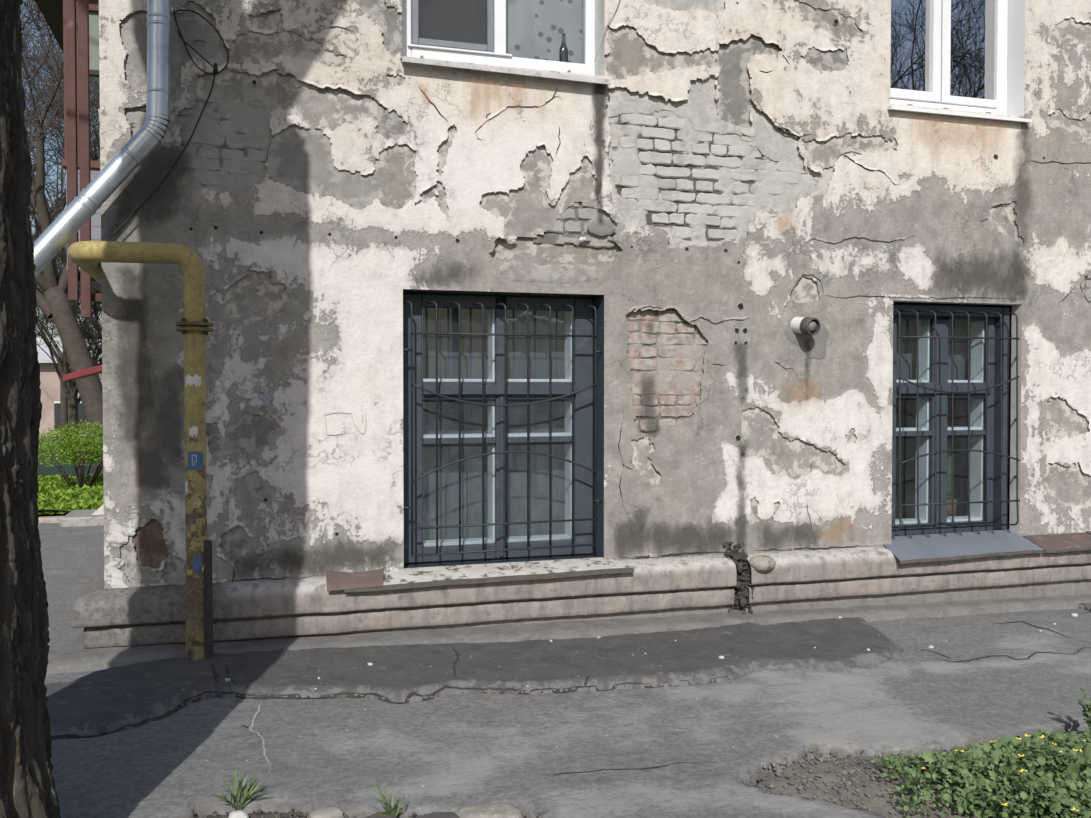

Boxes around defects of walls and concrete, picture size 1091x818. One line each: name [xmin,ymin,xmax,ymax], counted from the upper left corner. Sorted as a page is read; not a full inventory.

flaking render [119,10,147,137]
flaking render [170,0,457,218]
crack [475,89,559,140]
flaking render [479,22,898,265]
damp [118,270,149,439]
flaking render [625,305,708,485]
damp [737,345,747,398]
flaking render [735,407,845,477]
flaking render [1045,393,1090,439]
flaking render [118,519,186,583]
damp [616,473,746,554]
damp [763,525,817,547]